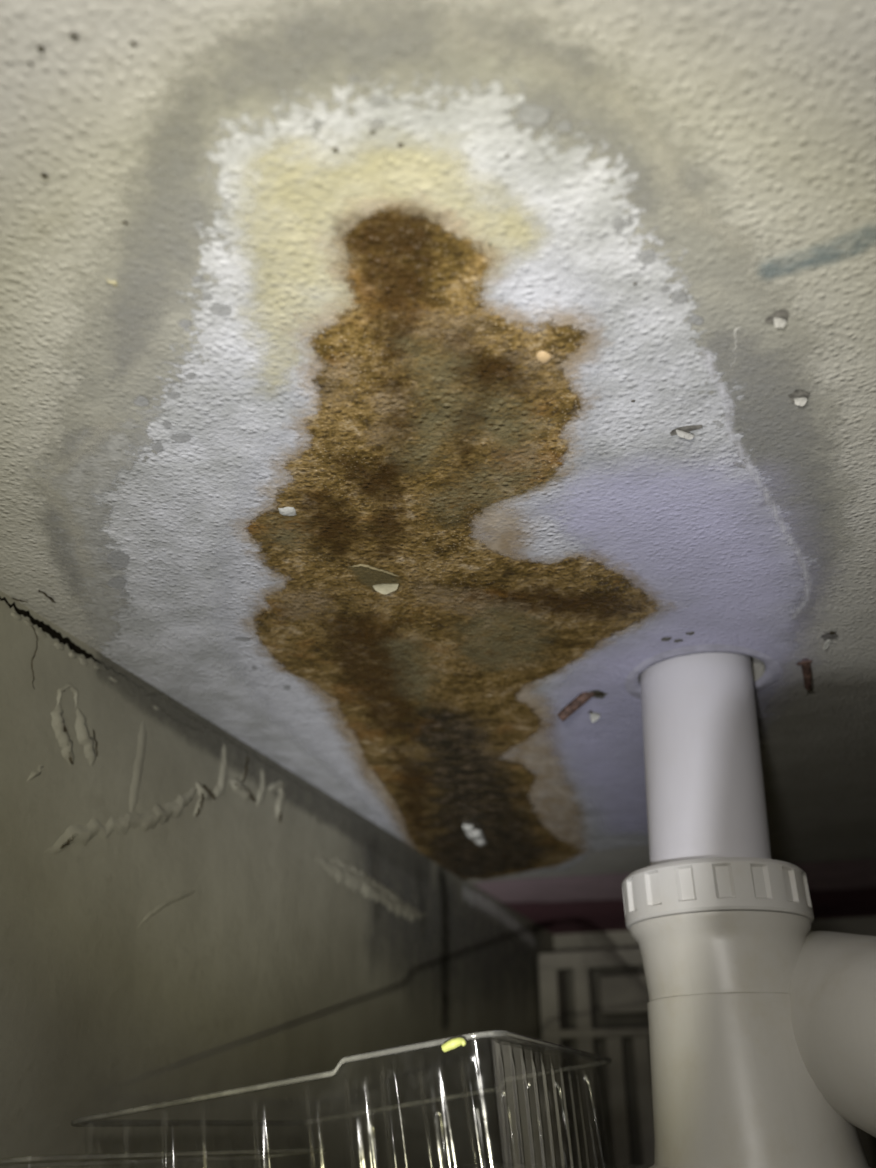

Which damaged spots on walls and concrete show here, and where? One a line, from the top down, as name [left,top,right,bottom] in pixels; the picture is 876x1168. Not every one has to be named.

peeling [764,310,789,328]
damp [31,0,856,876]
peeling [670,425,702,440]
peeling [788,390,810,406]
peeling [349,564,399,595]
corrosion [246,203,658,880]
crack [0,597,266,764]
peeling [44,720,285,854]